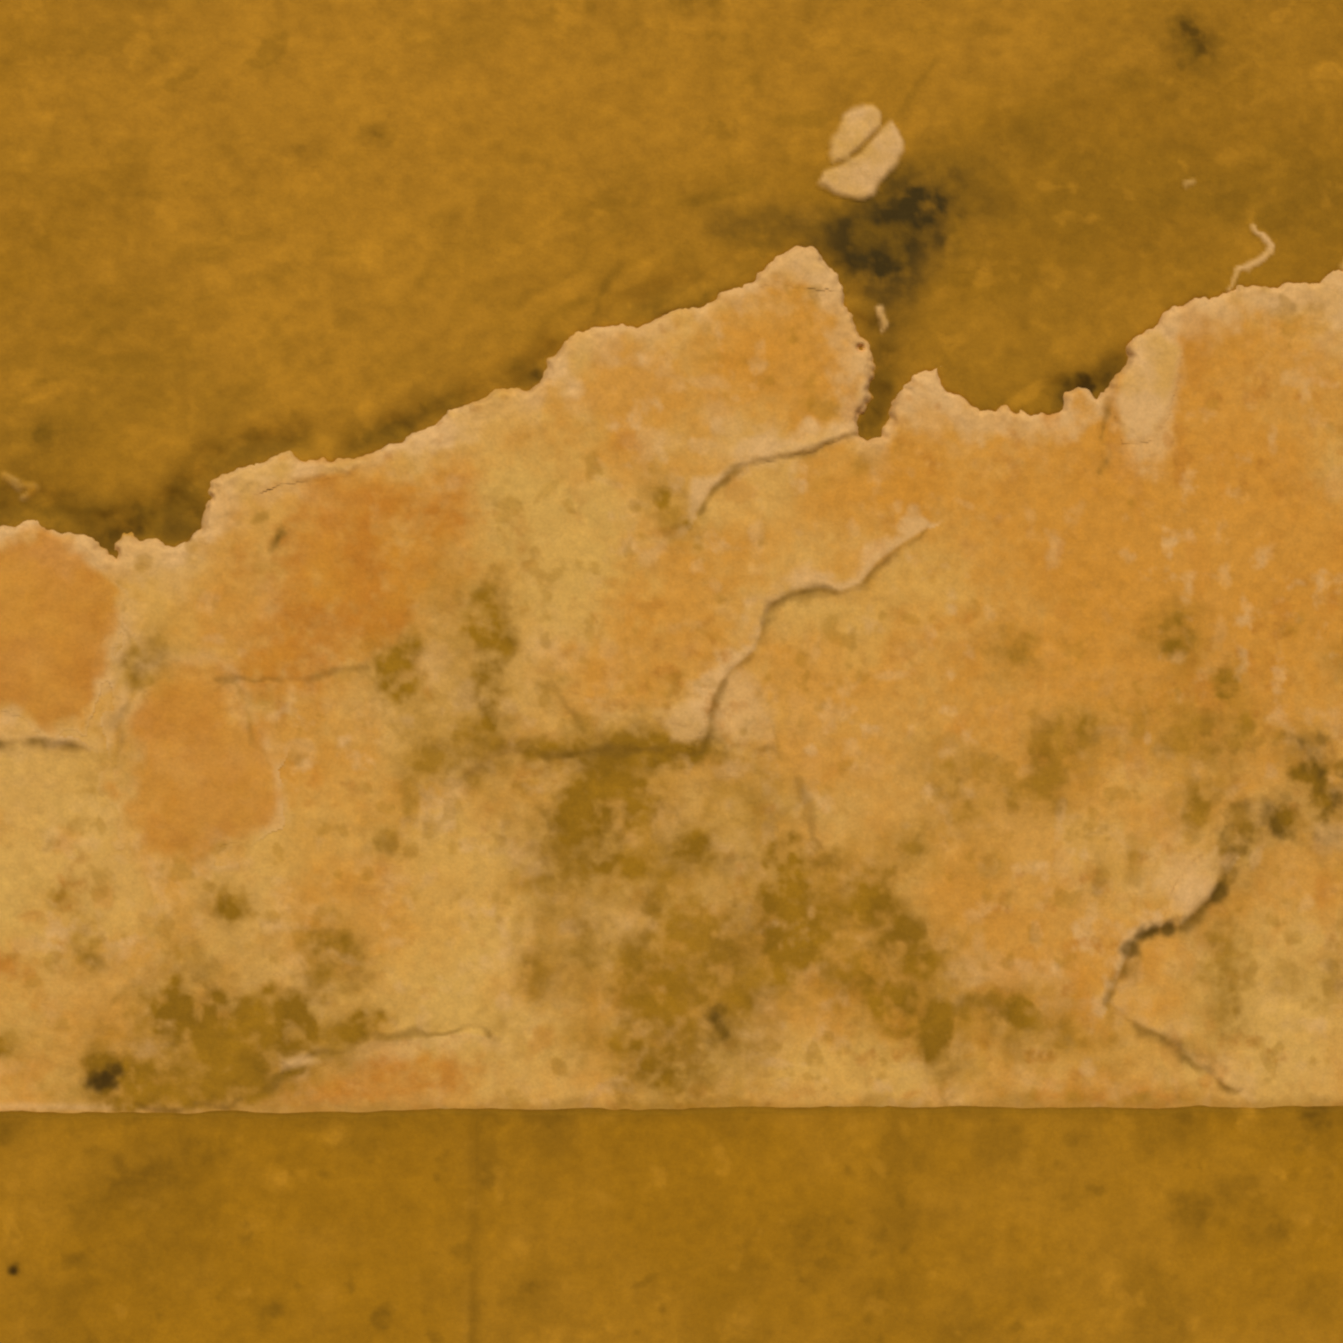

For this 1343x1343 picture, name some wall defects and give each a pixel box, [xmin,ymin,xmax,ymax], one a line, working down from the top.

peeling [814,101,906,202]
peeling [78,221,1343,831]
crack [694,429,860,520]
peeling [0,1070,36,1112]
crack [0,622,146,773]
peeling [214,700,512,1045]
crack [460,527,931,856]
water stain [344,510,1343,1110]
peeling [746,1019,962,1108]
peeling [929,760,1233,1030]
crack [1100,872,1246,1099]
peeling [1220,994,1343,1108]